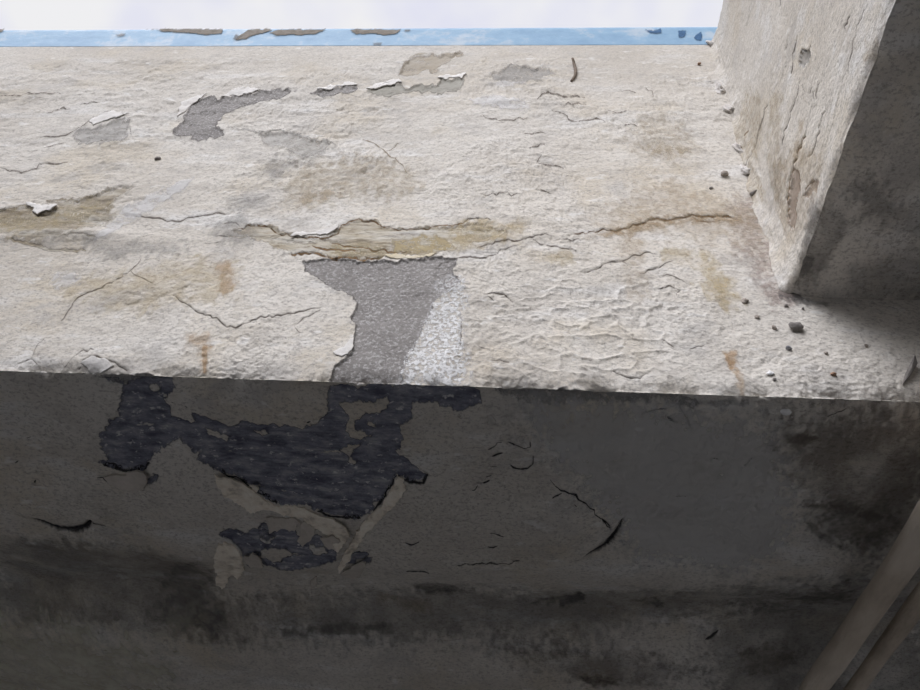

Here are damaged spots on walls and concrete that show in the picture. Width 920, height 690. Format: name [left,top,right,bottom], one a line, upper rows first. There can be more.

peeling [310,51,466,97]
peeling [73,110,130,144]
peeling [173,87,291,141]
spalling [0,187,130,253]
crack [456,214,736,259]
crack [61,261,151,321]
crack [176,297,320,332]
peeling [98,218,506,589]
crack [35,518,105,531]
crack [550,480,623,556]